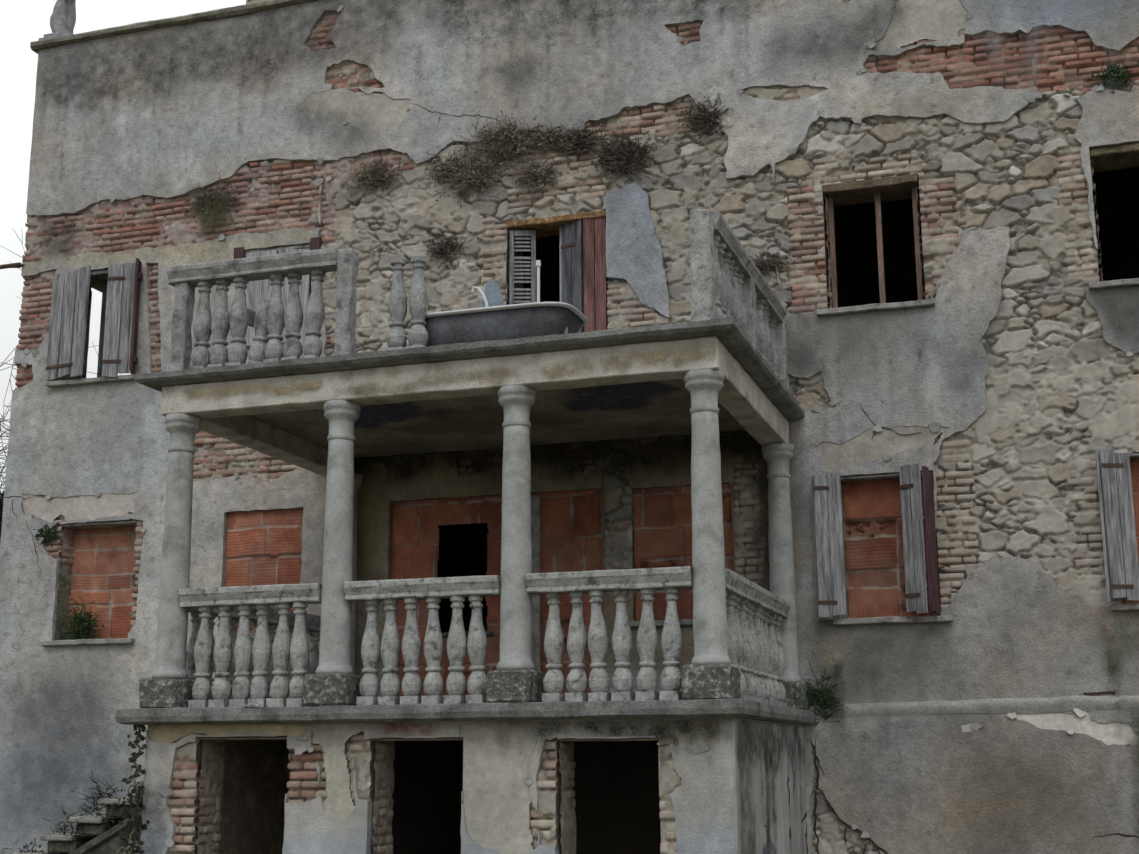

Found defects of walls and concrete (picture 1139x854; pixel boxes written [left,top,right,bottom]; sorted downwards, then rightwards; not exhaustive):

spalling [15,0,1139,628]
spalling [148,722,376,854]
flaking render [454,720,560,854]
damp [737,720,805,854]
crack [764,734,881,854]
flaking render [1007,708,1139,745]
crack [1089,833,1139,844]